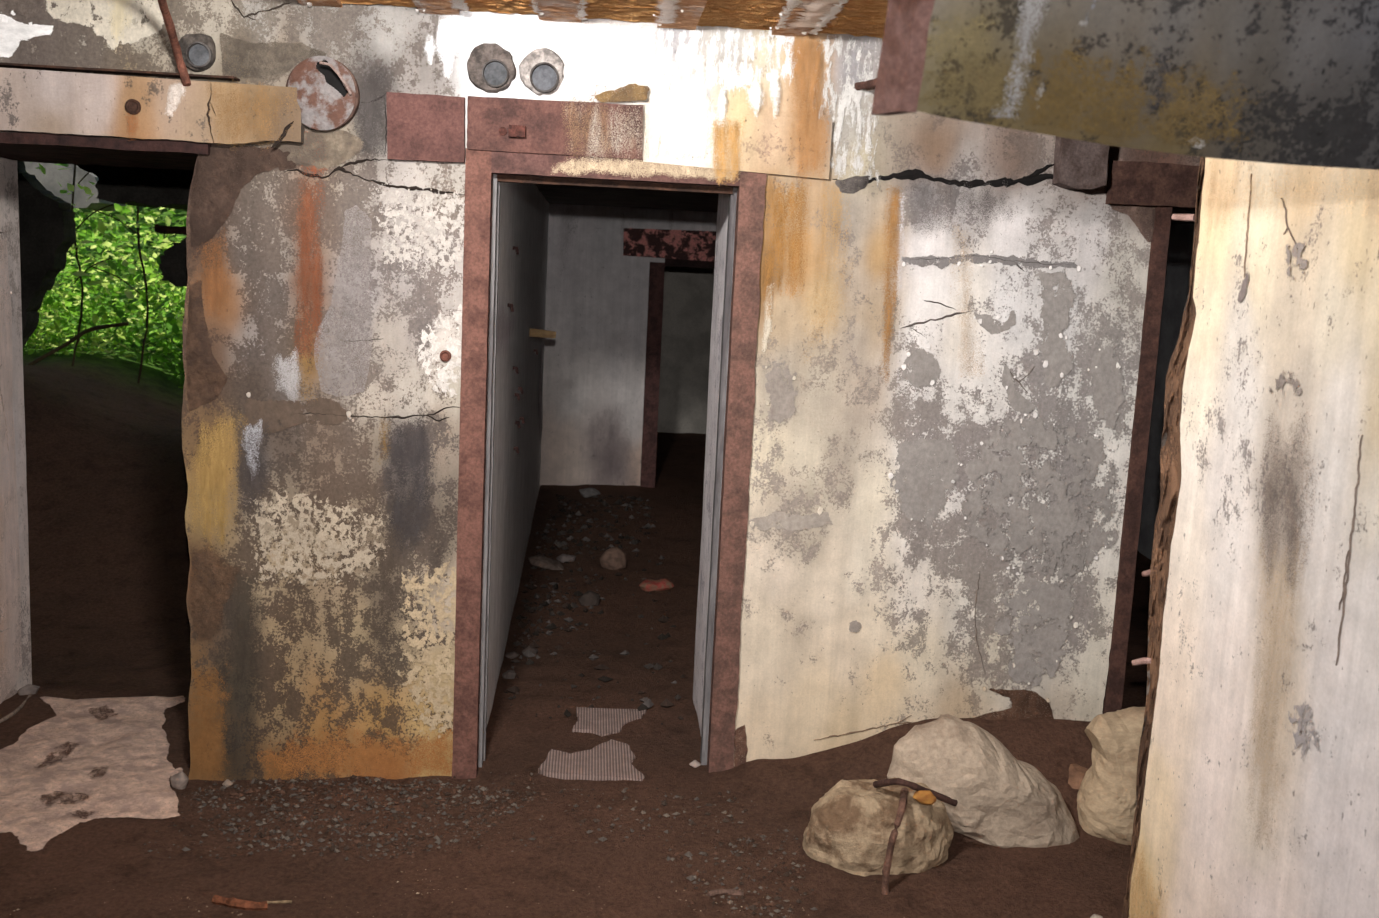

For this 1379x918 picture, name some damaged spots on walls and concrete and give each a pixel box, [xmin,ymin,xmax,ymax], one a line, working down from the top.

peeling [0,0,164,58]
crack [271,92,465,195]
corrosion [760,34,831,321]
crack [832,164,1054,188]
corrosion [293,132,327,403]
crack [921,255,1069,271]
crack [900,300,969,337]
crack [297,406,460,422]
water stain [235,419,274,522]